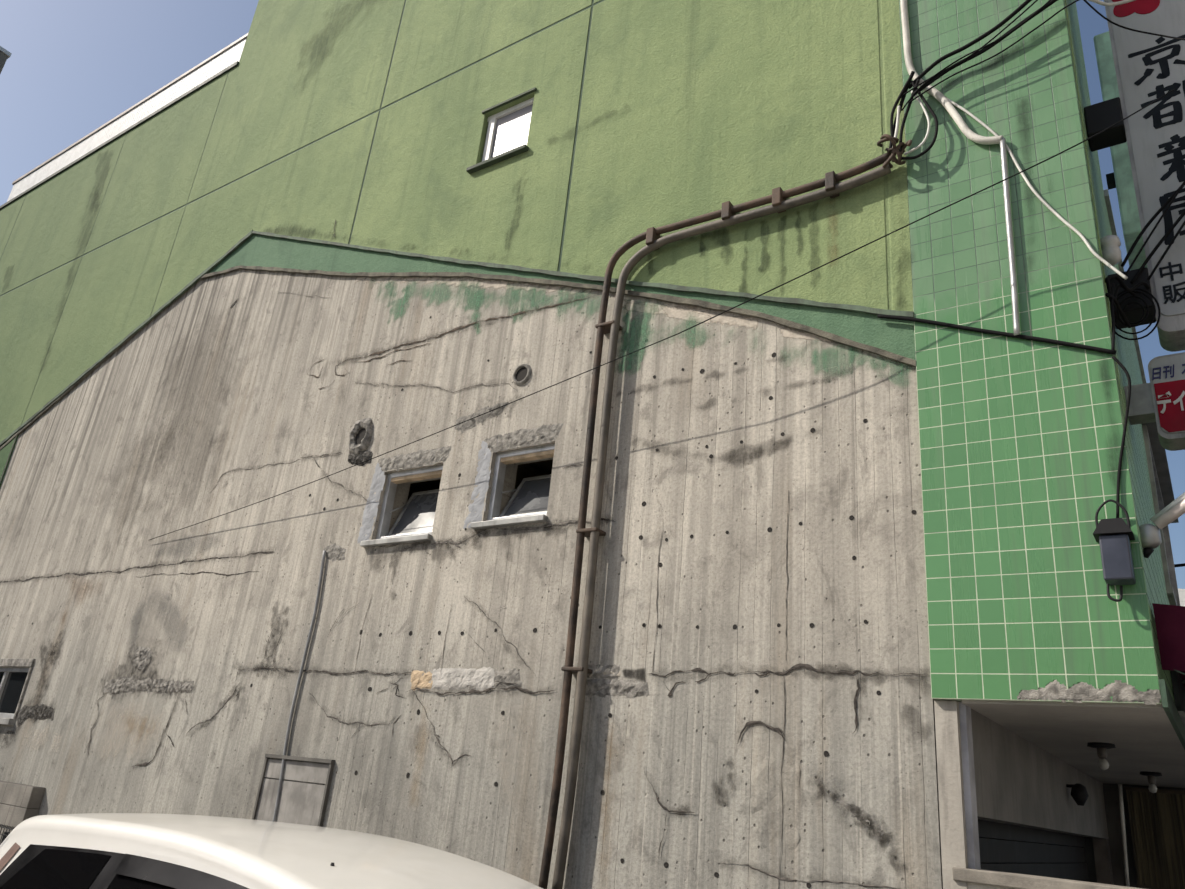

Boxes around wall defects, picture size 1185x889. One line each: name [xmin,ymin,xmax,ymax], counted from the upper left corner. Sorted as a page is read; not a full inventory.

peeling [355,277,592,295]
peeling [622,300,758,329]
peeling [781,329,833,342]
spalling [347,418,386,544]
crack [0,551,274,583]
crack [132,596,554,767]
peeling [410,667,522,691]
spalling [585,664,649,699]
crack [644,491,928,889]
spalling [1017,680,1161,705]